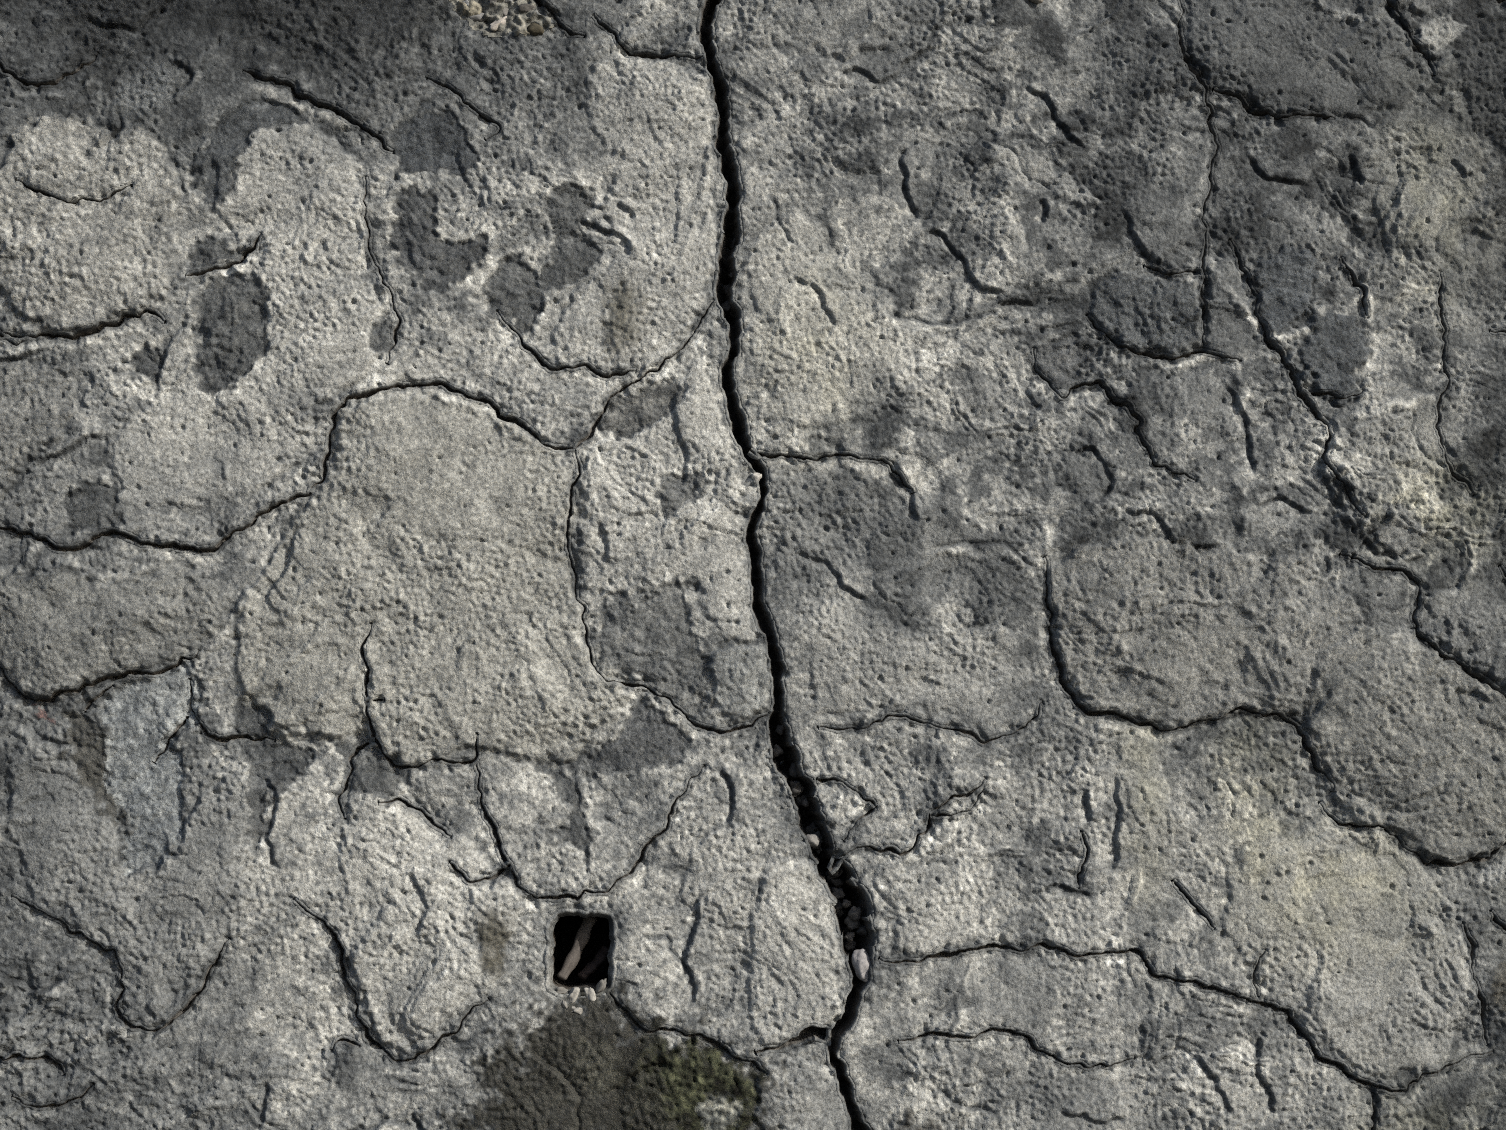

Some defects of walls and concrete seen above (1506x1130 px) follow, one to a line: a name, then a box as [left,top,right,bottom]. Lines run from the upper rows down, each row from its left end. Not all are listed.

crack [1384,0,1437,75]
crack [1490,0,1506,8]
crack [1031,0,1370,518]
crack [1490,327,1506,335]
crack [1433,271,1477,496]
crack [0,0,987,1130]
crack [818,552,1506,870]
crack [1074,831,1092,888]
crack [1172,879,1216,931]
crack [1490,910,1506,934]
crack [878,923,1493,1130]